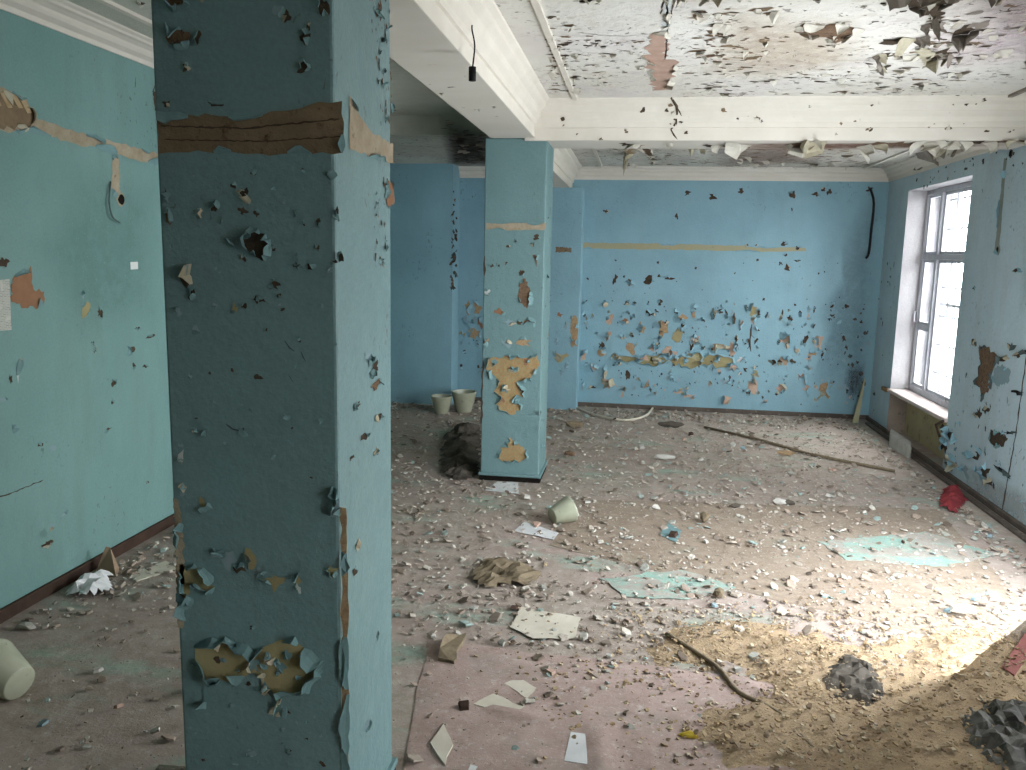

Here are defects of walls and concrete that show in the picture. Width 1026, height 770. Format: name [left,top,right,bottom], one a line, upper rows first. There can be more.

peeling [546,25,681,90]
peeling [652,0,743,66]
peeling [795,22,865,48]
peeling [837,0,1014,96]
peeling [688,120,1023,189]
peeling [0,257,45,309]
peeling [174,264,196,316]
peeling [459,241,879,415]
peeling [939,338,1026,489]
peeling [496,437,529,464]
peeling [326,486,362,770]
peeling [194,636,323,717]